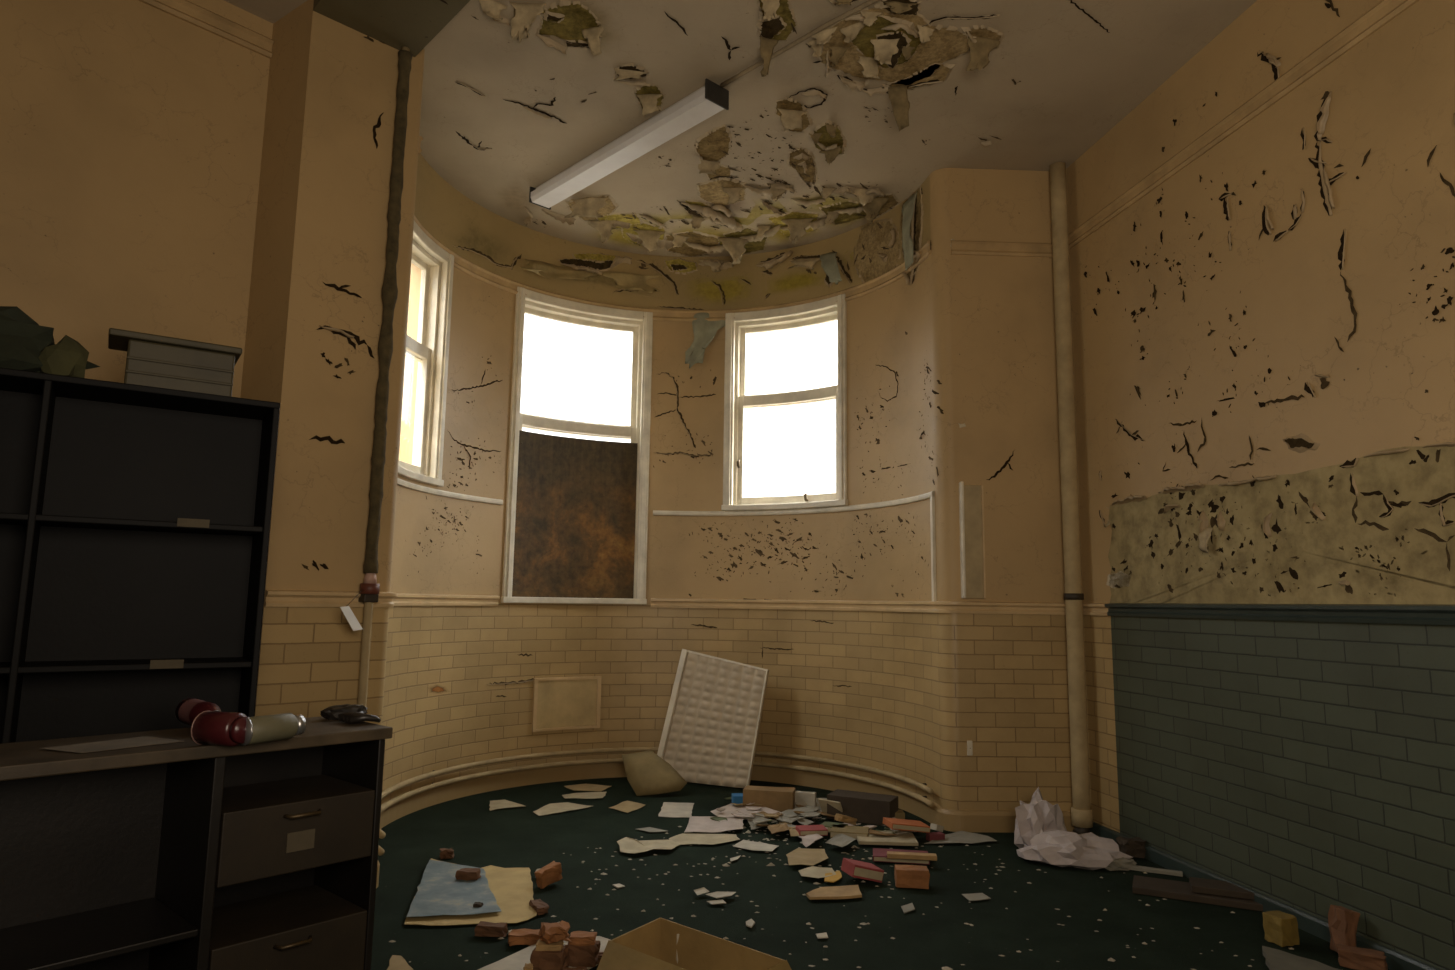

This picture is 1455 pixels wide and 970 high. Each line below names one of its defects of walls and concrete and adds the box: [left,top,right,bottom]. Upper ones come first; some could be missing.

peeling [452,0,1004,369]
crack [453,369,502,391]
crack [653,369,717,467]
peeling [689,513,929,600]